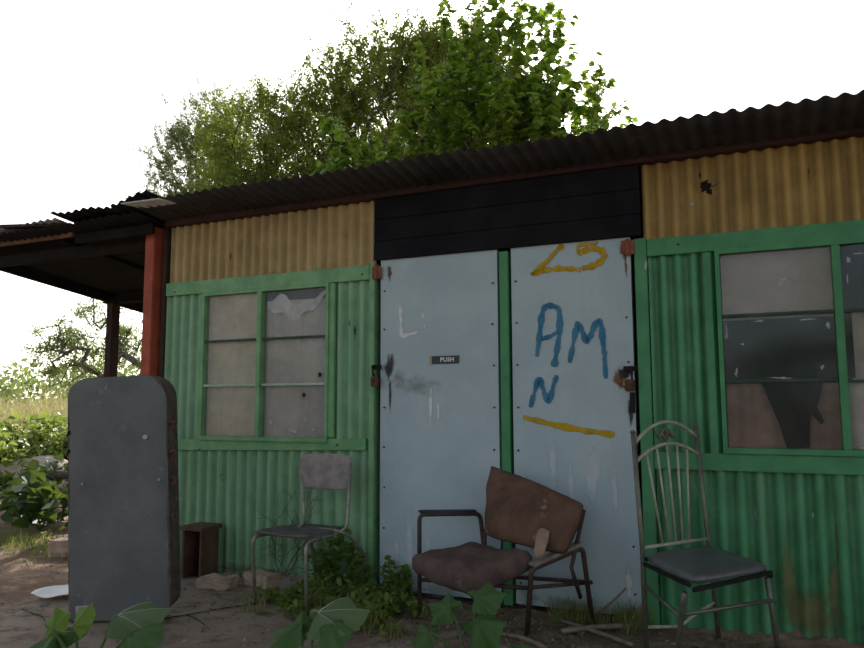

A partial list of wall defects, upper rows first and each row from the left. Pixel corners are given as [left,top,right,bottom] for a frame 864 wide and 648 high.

corrosion [614,370,631,388]